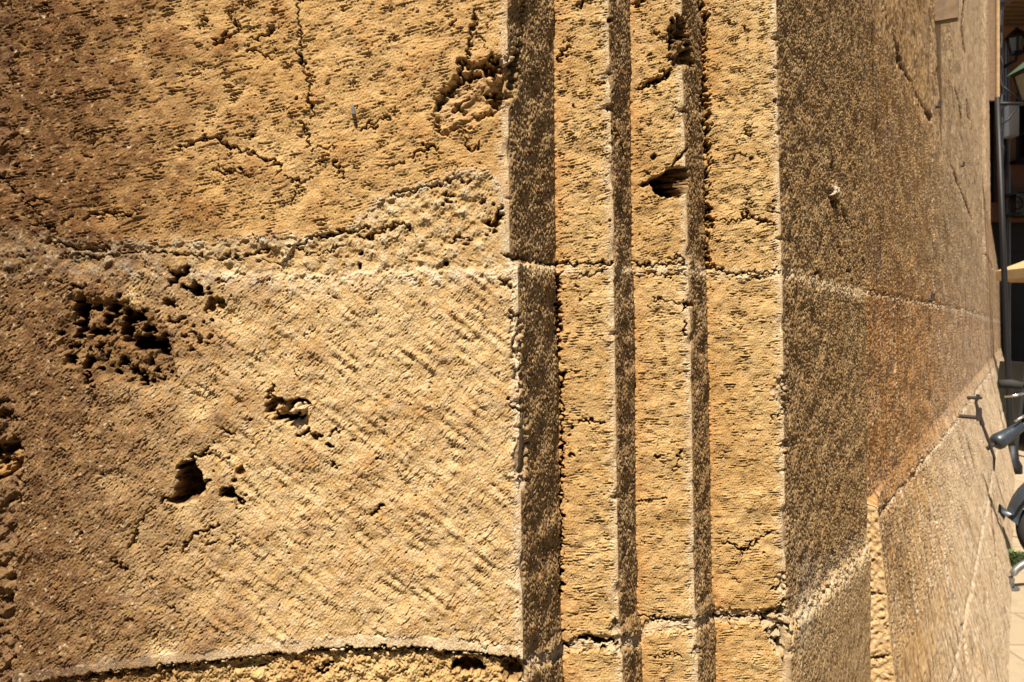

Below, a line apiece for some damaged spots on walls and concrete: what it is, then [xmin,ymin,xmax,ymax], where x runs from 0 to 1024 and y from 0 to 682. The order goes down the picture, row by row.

crack [176,0,346,206]
spalling [431,52,521,137]
spalling [640,148,689,199]
spalling [39,236,112,255]
spalling [179,277,228,295]
spalling [54,272,214,391]
spalling [247,397,341,470]
spalling [160,453,248,510]